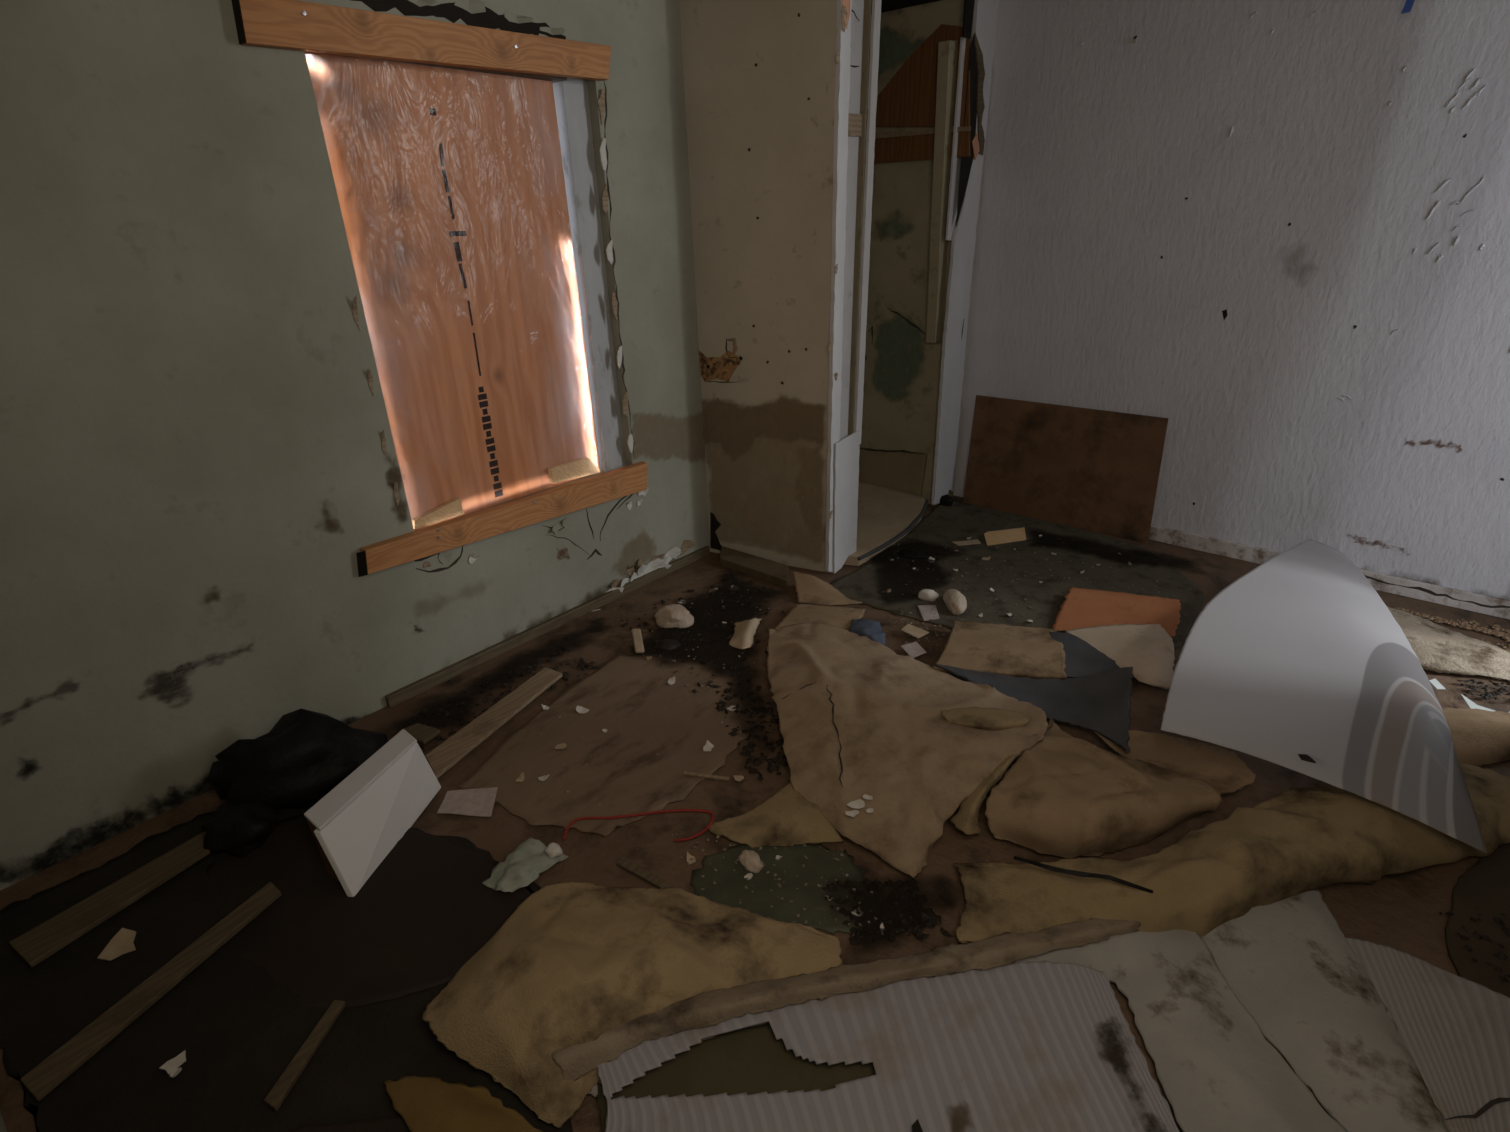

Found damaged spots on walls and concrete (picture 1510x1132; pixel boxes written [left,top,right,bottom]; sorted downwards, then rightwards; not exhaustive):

peeling [408,0,486,14]
peeling [504,11,565,35]
flaking render [597,80,635,458]
damp [634,398,825,562]